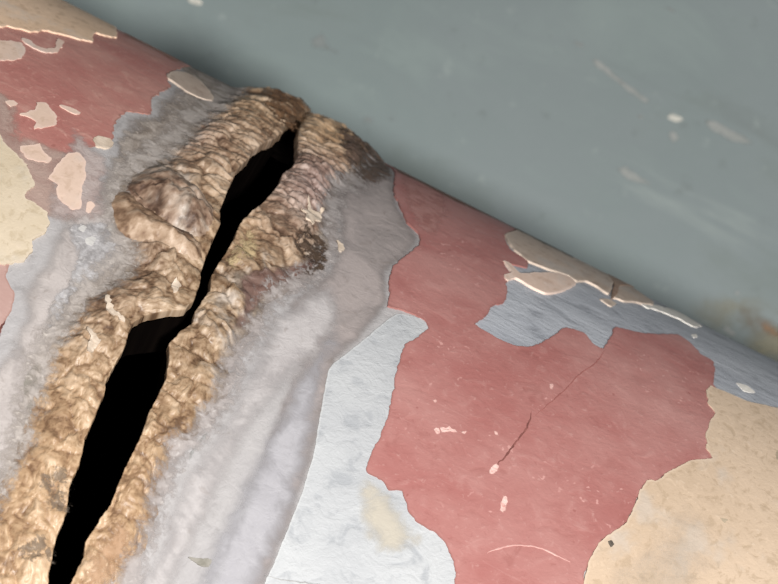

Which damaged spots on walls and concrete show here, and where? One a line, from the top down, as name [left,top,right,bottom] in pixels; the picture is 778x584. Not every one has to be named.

peeling [86,326,101,353]
peeling [0,0,214,326]
damp [0,66,253,499]
crack [84,285,208,442]
crack [220,124,296,213]
damp [111,154,415,584]
peeling [265,163,778,584]
crack [497,351,604,465]